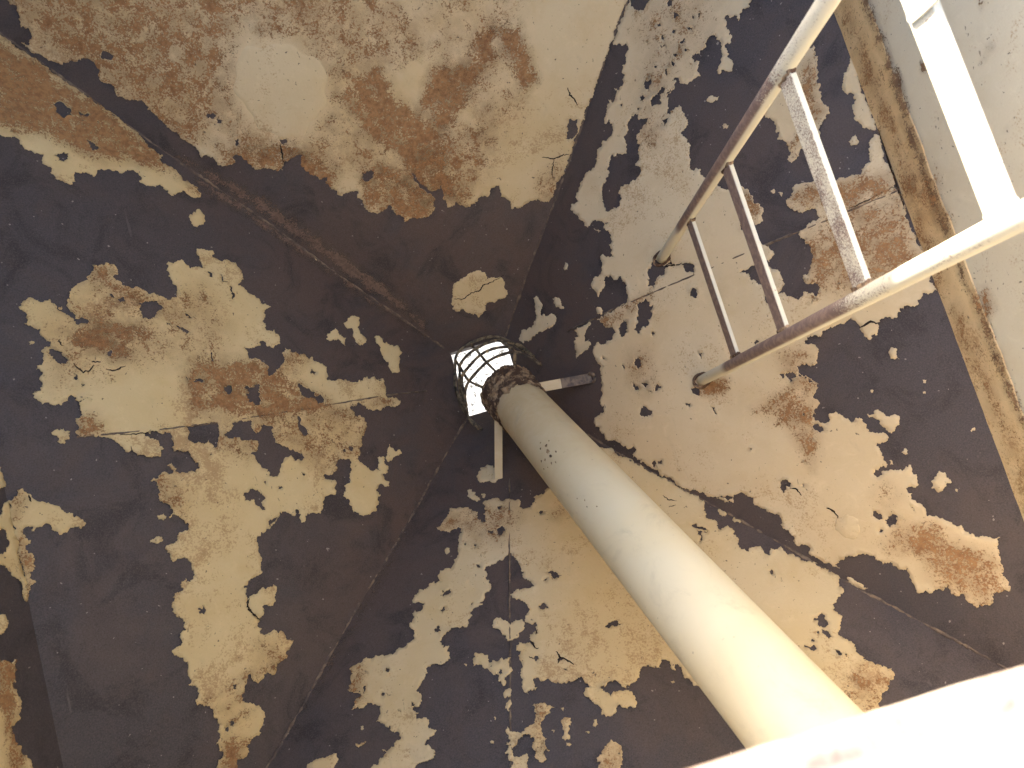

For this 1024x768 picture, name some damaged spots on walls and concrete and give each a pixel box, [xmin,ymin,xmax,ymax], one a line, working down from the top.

corrosion [0,0,540,331]
peeling [0,0,628,222]
corrosion [834,0,954,279]
peeling [0,467,86,602]
peeling [19,249,402,768]
corrosion [43,263,393,475]
peeling [451,270,508,317]
peeling [349,465,698,768]
corrosion [752,349,820,464]
peeling [570,0,1011,713]
corrosion [885,520,1006,607]
corrosion [934,263,1024,490]